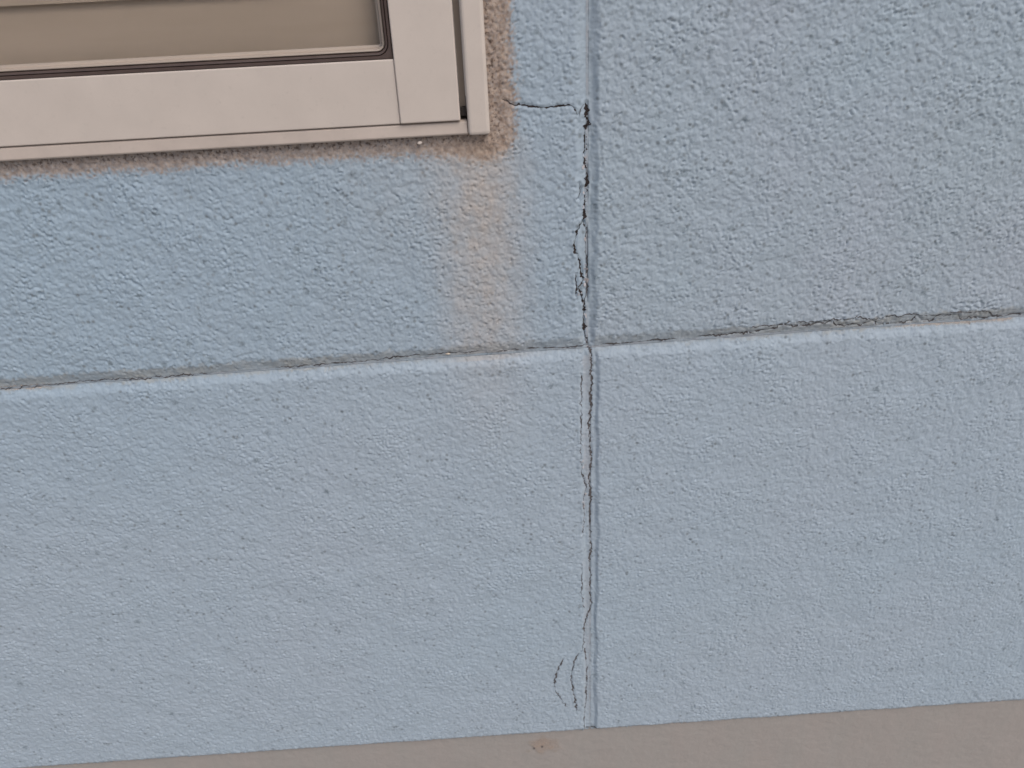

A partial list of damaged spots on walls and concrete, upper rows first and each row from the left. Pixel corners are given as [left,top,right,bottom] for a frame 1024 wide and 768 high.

crack [279,99,676,728]
crack [701,310,1022,337]